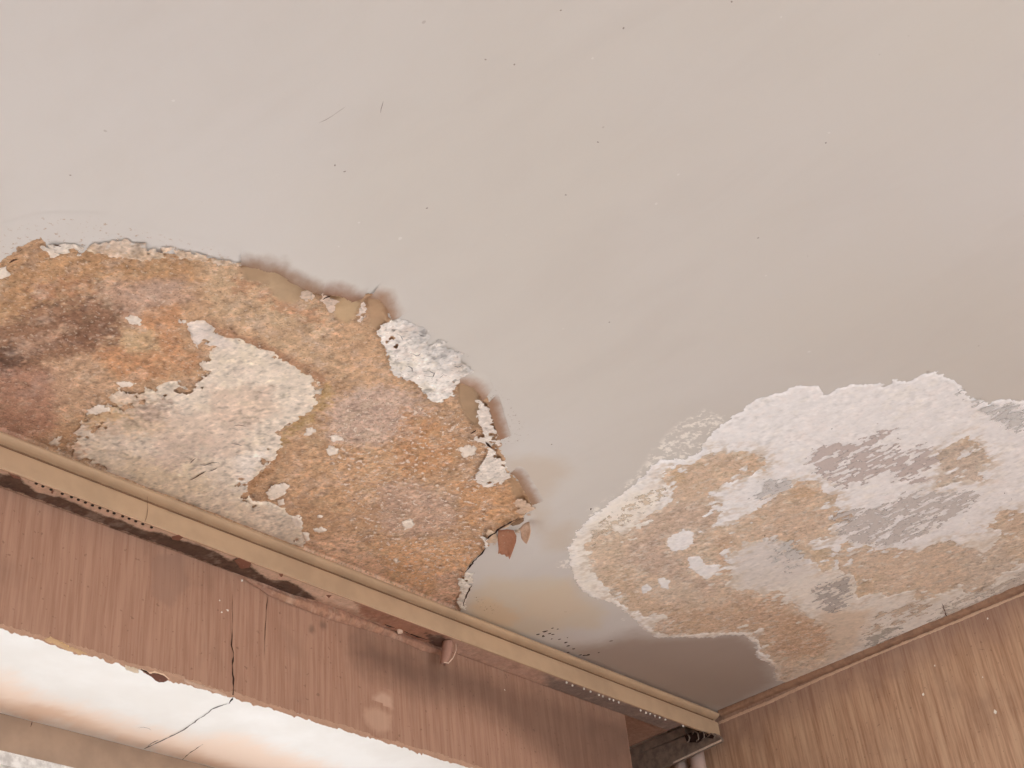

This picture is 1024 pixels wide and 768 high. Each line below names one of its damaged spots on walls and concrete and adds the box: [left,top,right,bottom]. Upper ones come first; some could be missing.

crack [140,594,234,760]
flaking render [0,210,544,611]
peeling [550,371,1024,725]